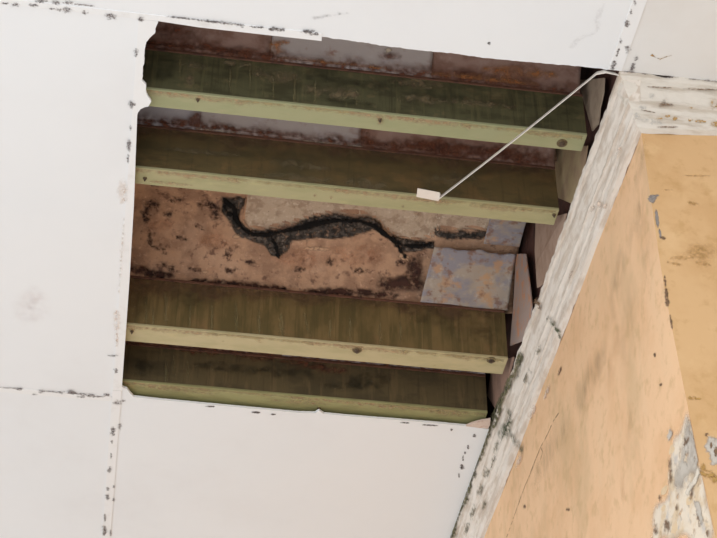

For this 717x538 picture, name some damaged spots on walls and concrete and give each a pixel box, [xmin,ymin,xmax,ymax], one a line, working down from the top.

rust [145,26,292,66]
rust [301,53,565,107]
rust [137,113,547,171]
crack [222,199,432,259]
spalling [199,195,490,266]
rust [129,258,493,315]
leakage [450,353,527,538]
peeling [653,416,713,538]
peeling [705,433,717,465]